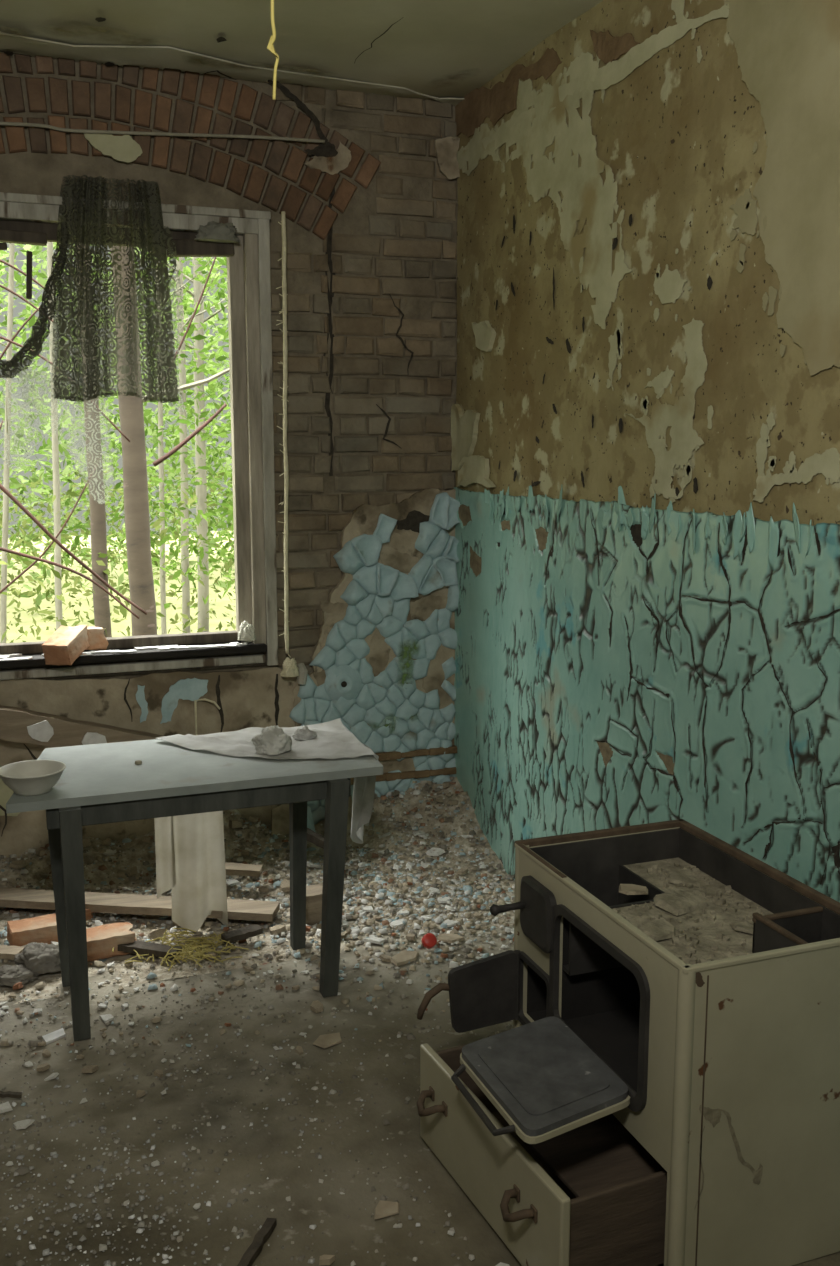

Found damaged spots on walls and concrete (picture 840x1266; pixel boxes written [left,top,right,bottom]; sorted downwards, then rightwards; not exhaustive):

crack [544,520,556,584]
peeling [289,248,840,902]
peeling [27,720,54,742]
peeling [82,732,107,745]
peeling [135,678,208,724]
crack [590,511,840,885]
spalling [342,813,460,944]